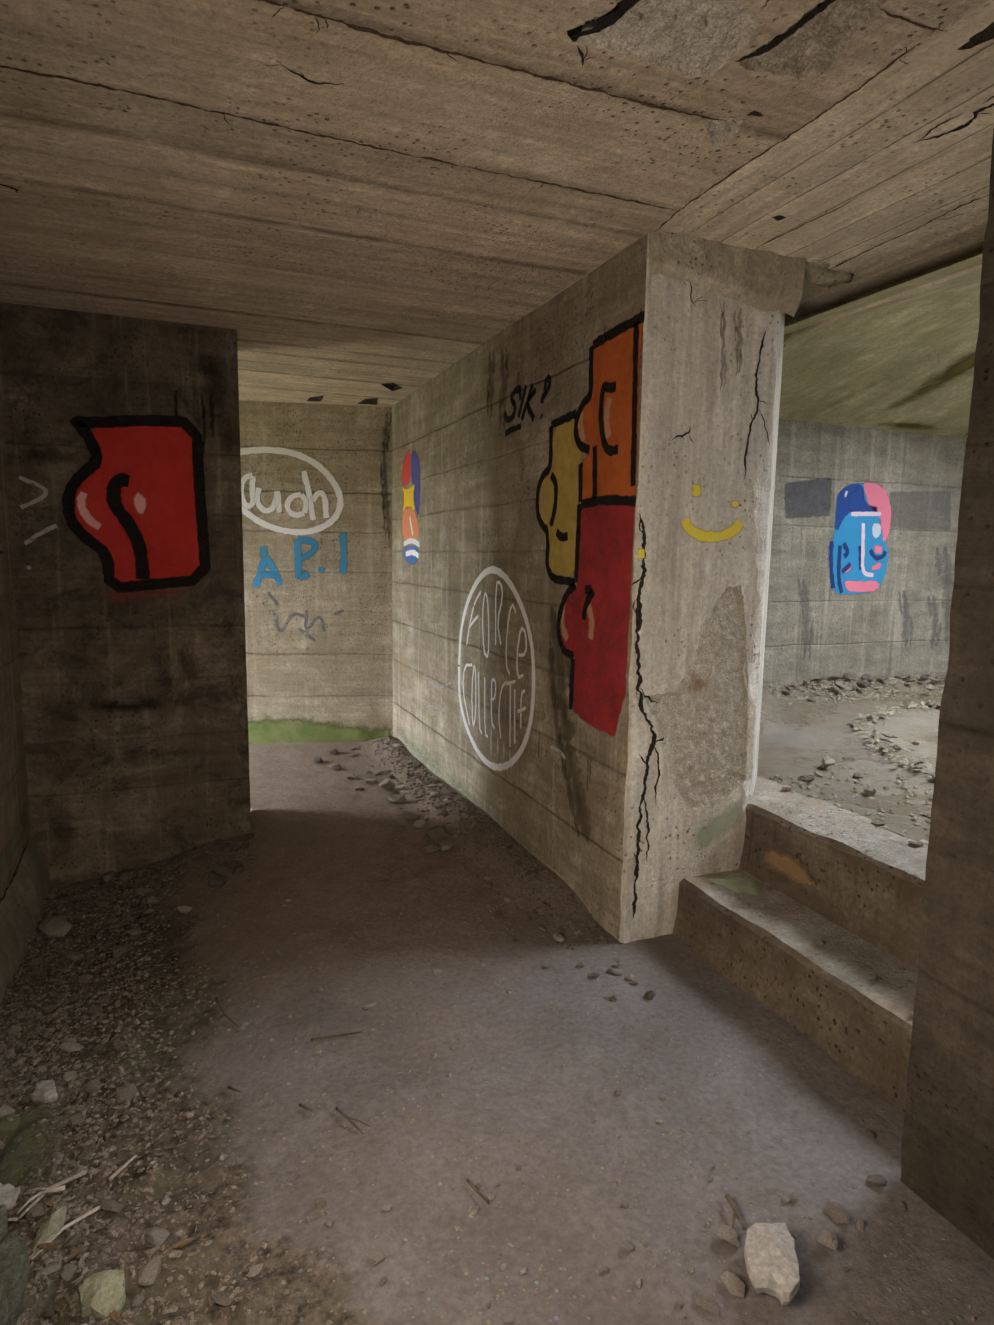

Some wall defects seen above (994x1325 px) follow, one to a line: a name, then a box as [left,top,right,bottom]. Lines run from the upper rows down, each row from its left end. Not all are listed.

crack [0,0,943,232]
spalling [561,0,887,80]
crack [913,96,994,143]
spalling [957,22,994,50]
crack [631,513,664,918]
spalling [645,585,749,812]